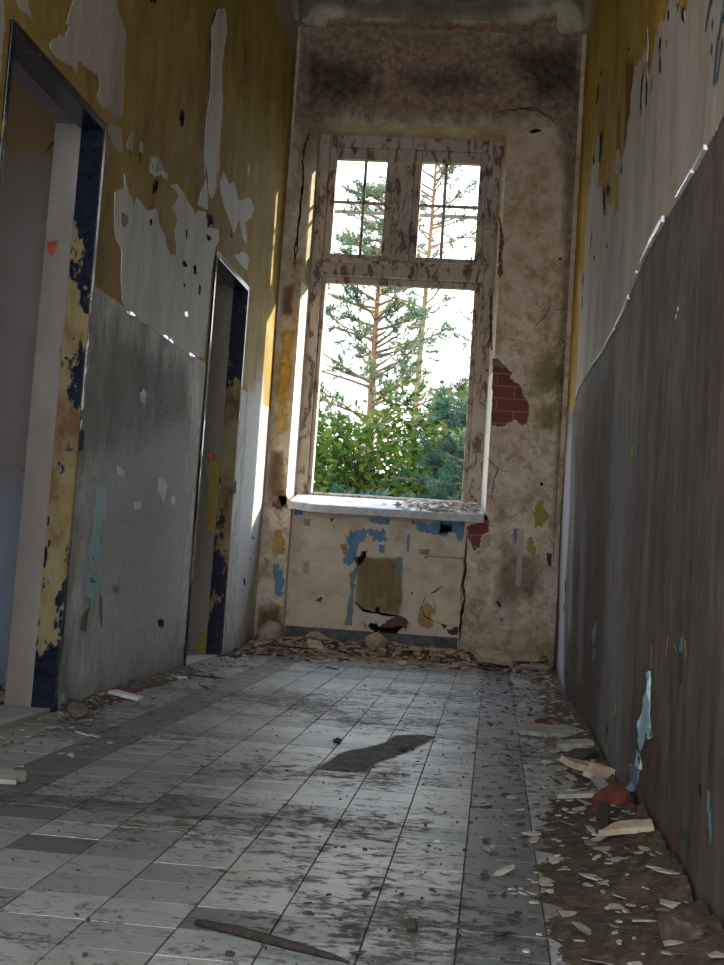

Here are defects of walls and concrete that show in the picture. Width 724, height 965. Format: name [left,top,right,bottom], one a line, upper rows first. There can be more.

peeling [49,0,255,358]
peeling [575,0,724,402]
water stain [294,0,582,682]
flaking render [489,297,529,427]
peeling [341,519,390,626]
flaking render [365,604,458,635]
peeling [397,514,491,579]
peeling [610,644,652,820]
peeling [493,864,515,876]
peeling [498,671,691,945]
peeling [699,783,712,843]
peeling [661,940,684,955]